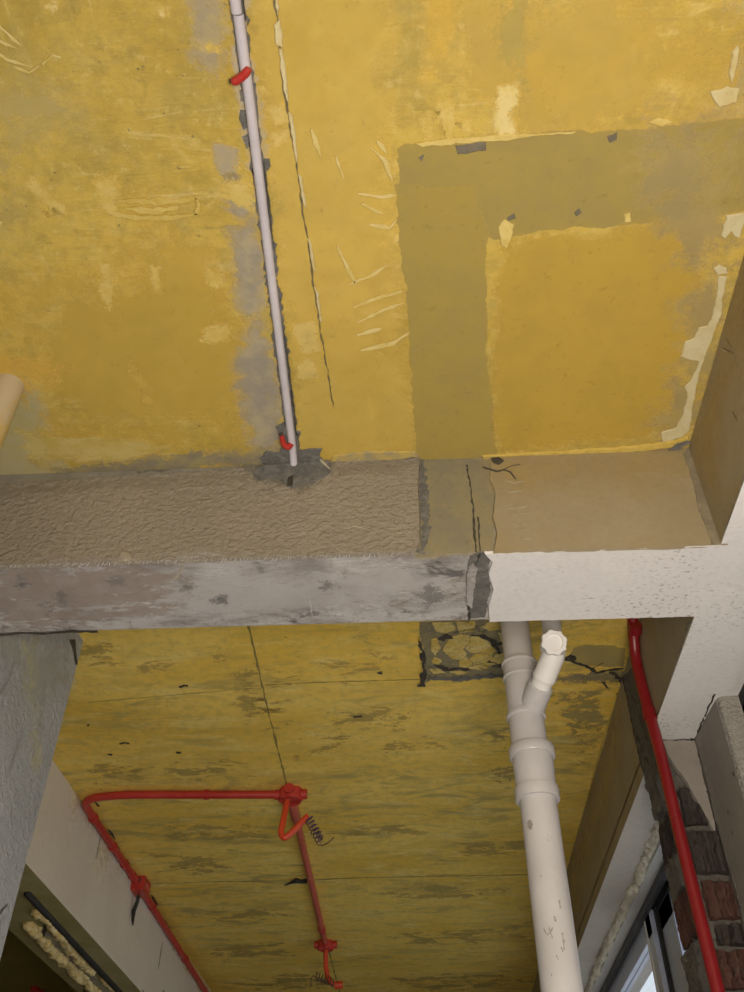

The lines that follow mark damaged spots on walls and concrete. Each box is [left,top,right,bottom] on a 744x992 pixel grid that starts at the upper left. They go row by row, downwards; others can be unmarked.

flaking render [710,45,740,107]
flaking render [721,213,744,238]
flaking render [661,264,728,451]
spalling [415,458,504,687]
water stain [231,669,293,730]
water stain [311,707,444,754]
water stain [149,824,267,875]
water stain [455,840,525,856]